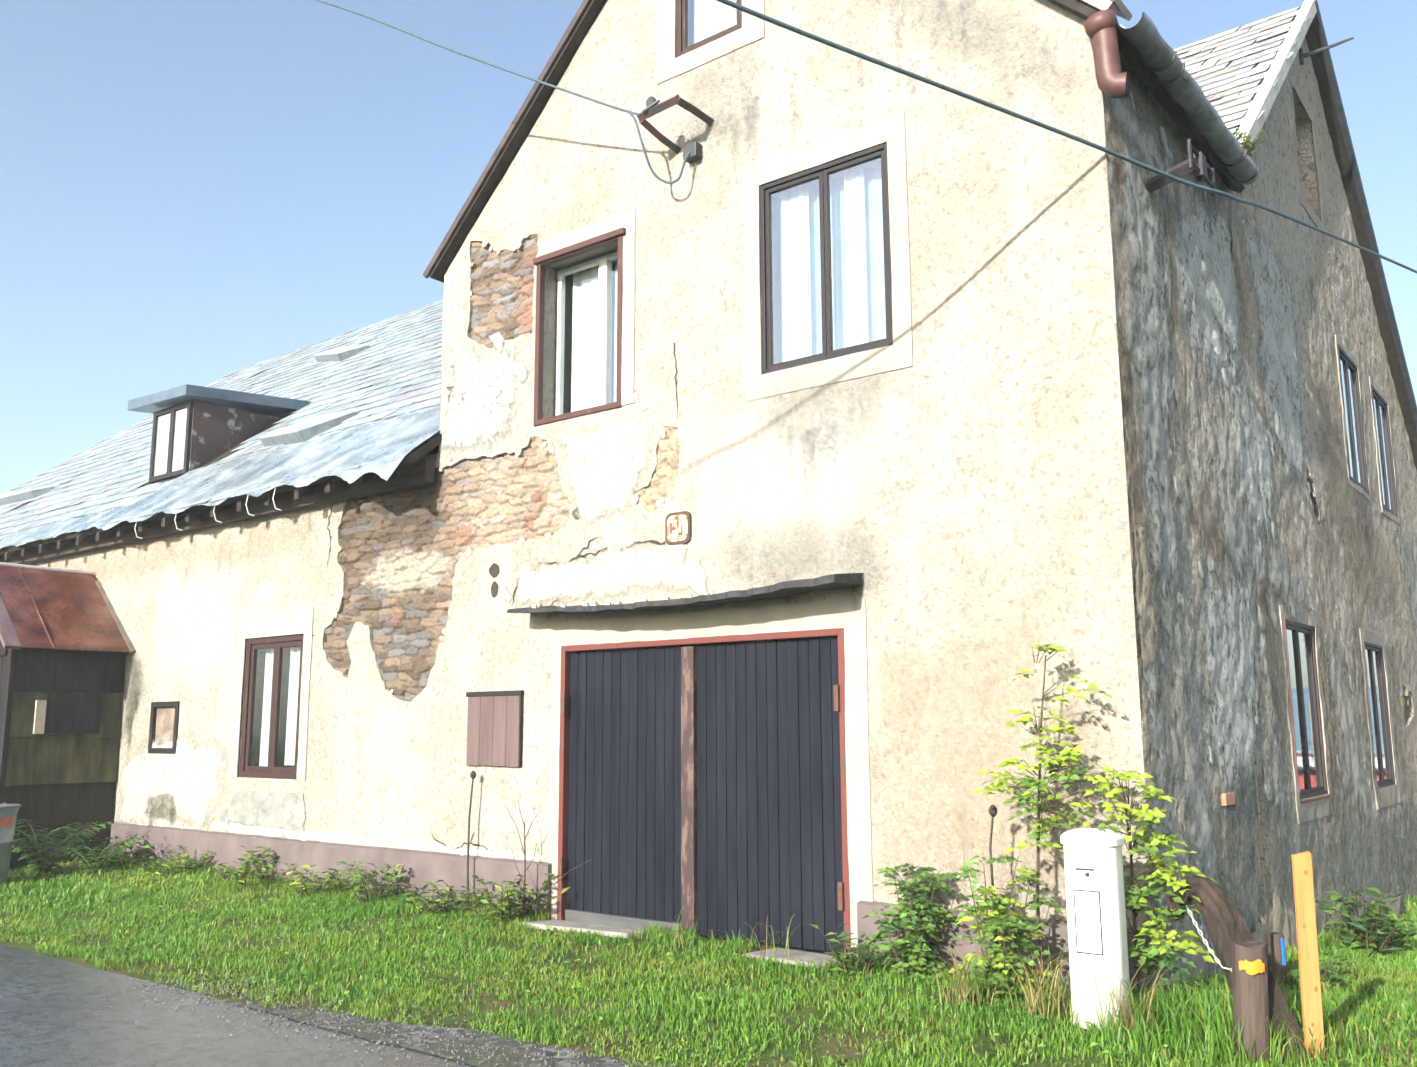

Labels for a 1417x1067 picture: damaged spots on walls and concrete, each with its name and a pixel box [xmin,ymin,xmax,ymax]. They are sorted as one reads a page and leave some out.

flaking render [324,234,708,701]
peeling [1108,89,1321,993]
flaking render [1315,902,1351,942]